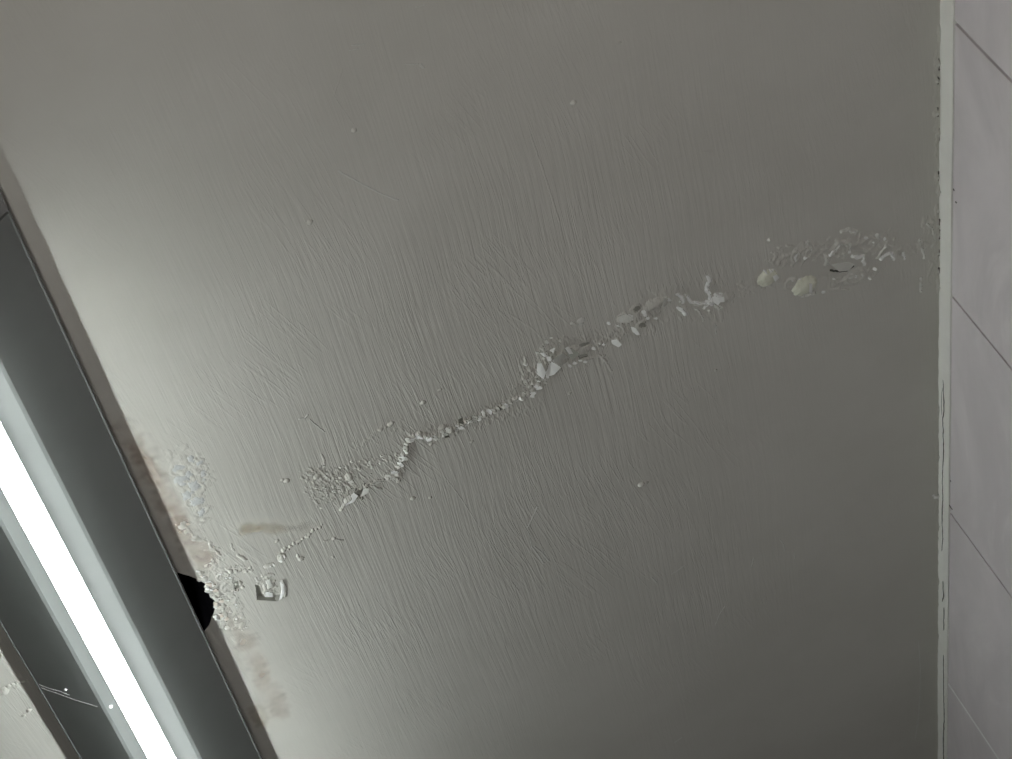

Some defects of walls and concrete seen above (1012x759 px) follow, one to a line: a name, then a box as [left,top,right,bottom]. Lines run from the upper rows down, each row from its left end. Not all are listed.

damp [153,443,217,526]
peeling [299,423,405,511]
crack [370,377,546,484]
spalling [196,557,288,633]